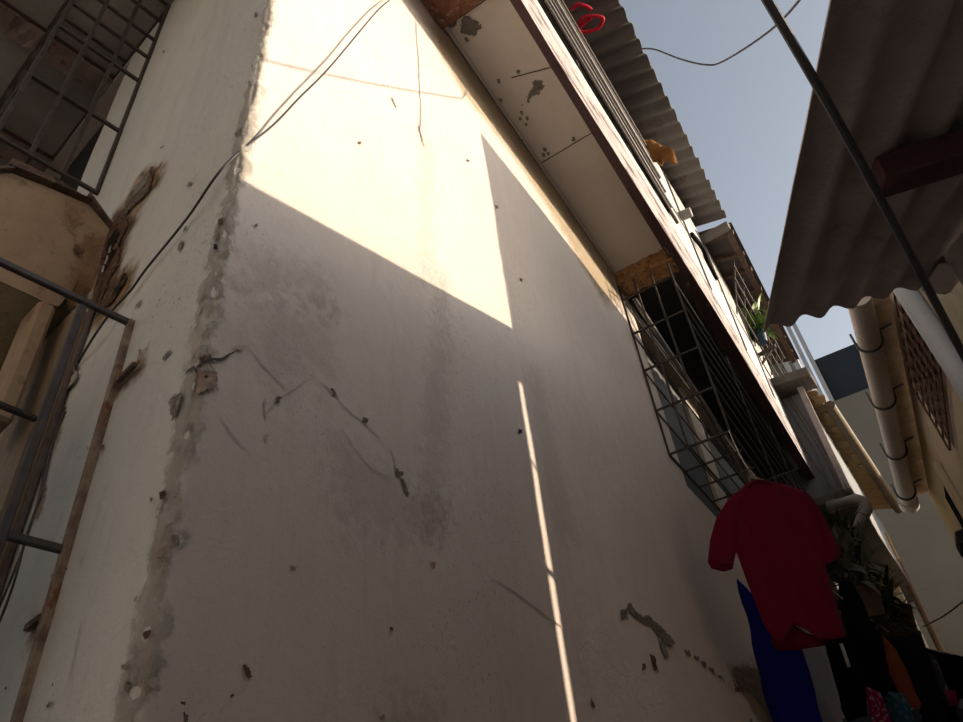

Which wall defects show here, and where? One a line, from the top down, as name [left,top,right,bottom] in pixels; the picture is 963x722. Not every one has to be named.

peeling [518,80,545,126]
spalling [90,164,164,326]
peeling [113,0,275,722]
crack [218,346,409,495]
peeling [621,603,675,672]
peeling [685,650,772,722]